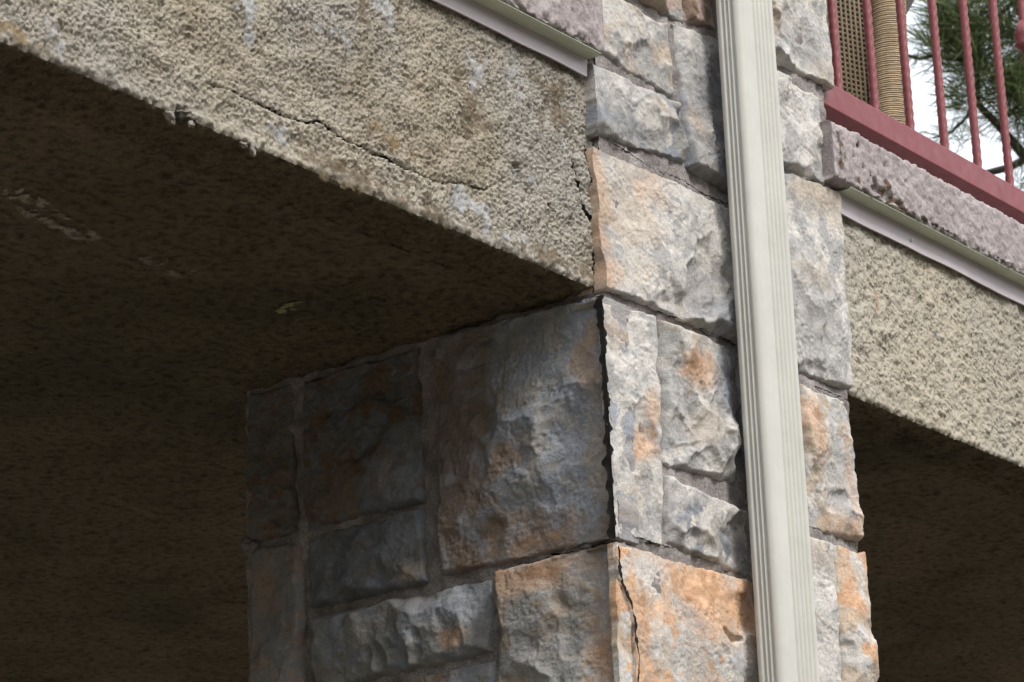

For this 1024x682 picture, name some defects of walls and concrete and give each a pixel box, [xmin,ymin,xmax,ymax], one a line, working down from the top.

crack [210,84,502,191]
crack [516,138,737,682]